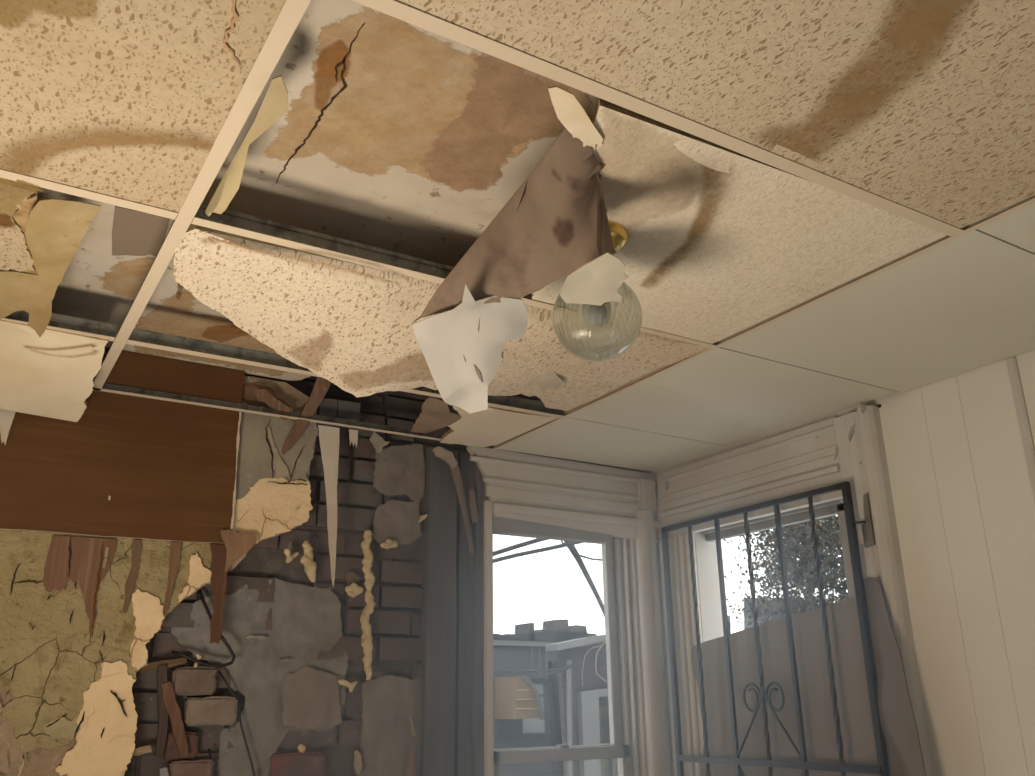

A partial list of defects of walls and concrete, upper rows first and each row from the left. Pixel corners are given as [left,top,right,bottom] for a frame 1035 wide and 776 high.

damp [0,0,94,26]
crack [222,0,241,68]
crack [276,23,365,183]
damp [264,8,592,191]
damp [774,0,965,158]
damp [0,132,213,226]
peeling [232,412,319,544]
peeling [370,431,389,453]
crack [10,563,51,600]
peeling [0,529,224,776]
crack [46,690,127,738]
peeling [353,750,362,774]